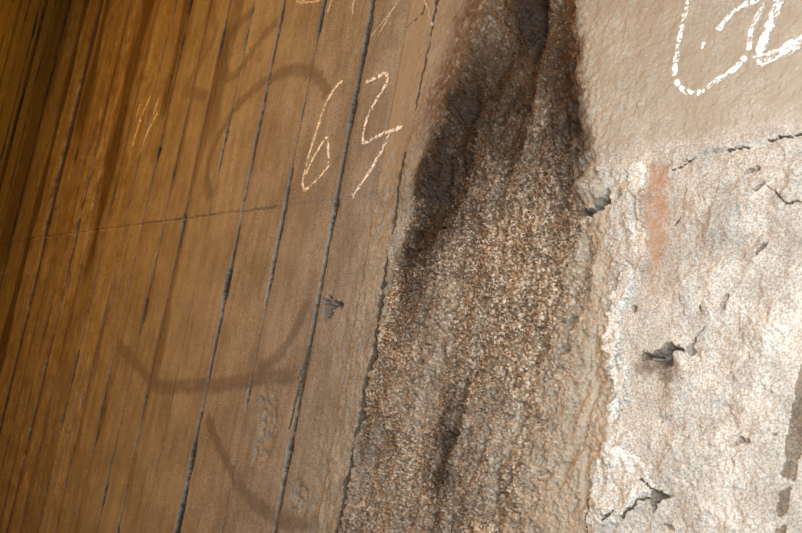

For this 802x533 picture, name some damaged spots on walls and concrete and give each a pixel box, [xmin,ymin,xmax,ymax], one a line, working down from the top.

leakage [401,0,589,271]
crack [768,133,802,142]
spalling [338,0,673,533]
hole [642,342,697,366]
leakage [435,427,461,489]